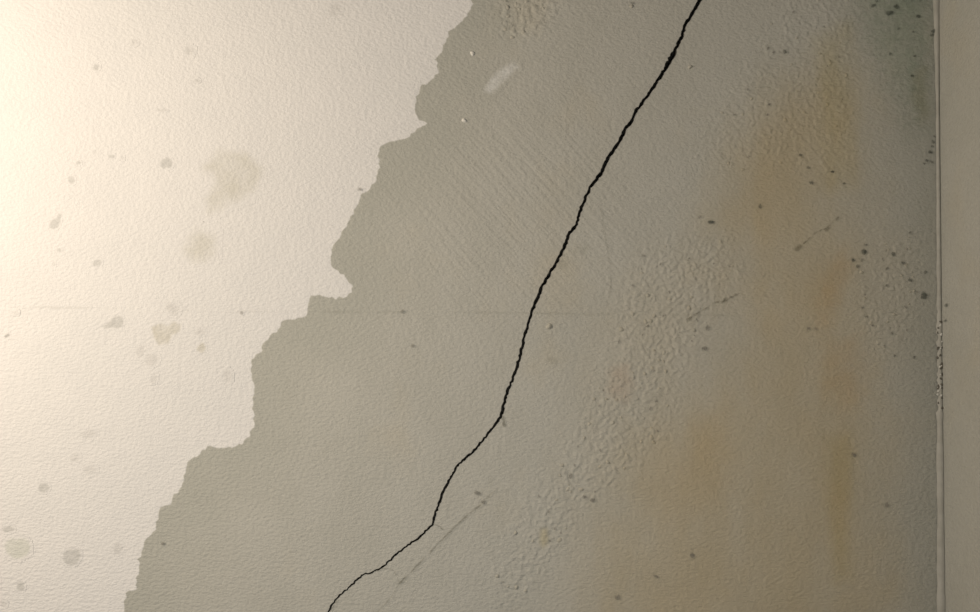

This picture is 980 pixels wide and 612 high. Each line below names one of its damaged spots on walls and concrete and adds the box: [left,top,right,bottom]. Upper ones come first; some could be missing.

damp [133,299,208,385]
damp [175,142,271,271]
crack [328,0,702,612]
damp [939,0,980,612]